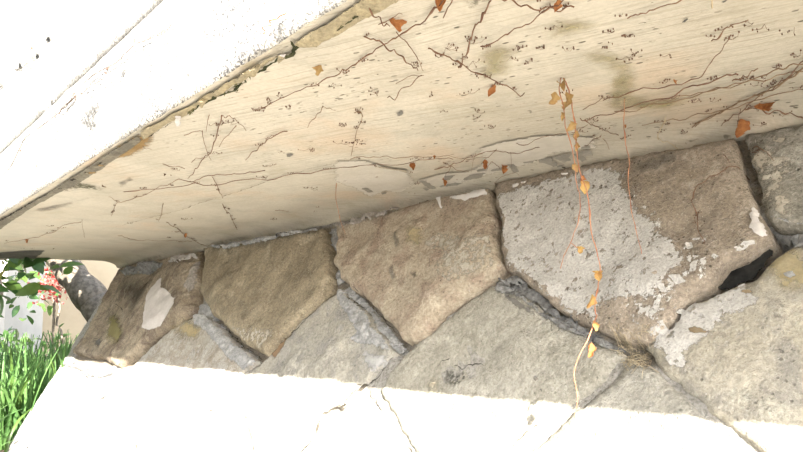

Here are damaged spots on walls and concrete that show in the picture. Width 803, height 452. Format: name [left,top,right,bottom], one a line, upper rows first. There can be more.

spalling [295,0,399,48]
spalling [0,54,286,229]
peeling [334,135,773,368]
crack [301,284,401,451]